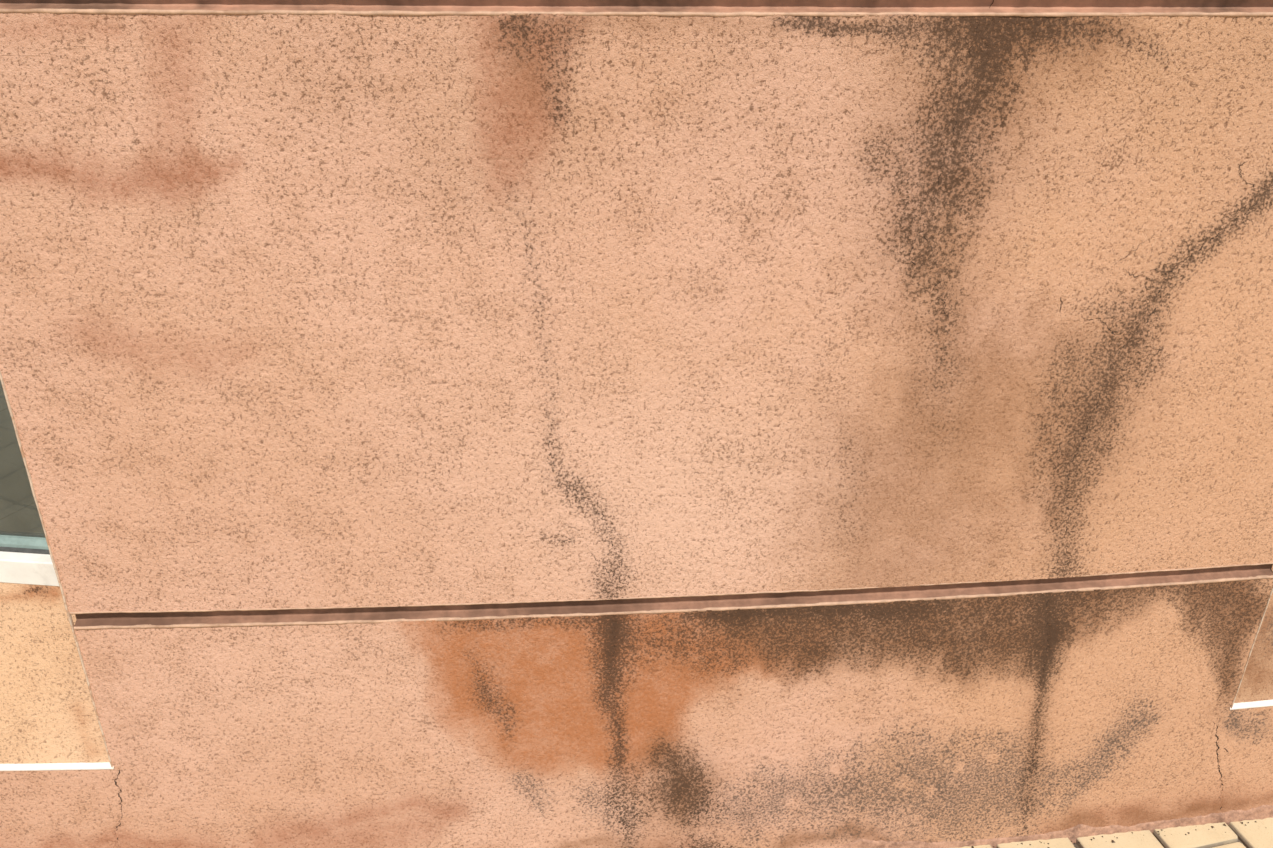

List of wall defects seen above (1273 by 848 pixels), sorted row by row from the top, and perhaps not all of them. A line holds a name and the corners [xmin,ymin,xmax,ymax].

damp [0,13,254,222]
damp [31,297,277,401]
crack [499,197,645,600]
damp [452,13,1273,848]
crack [1012,152,1273,809]
damp [0,583,65,616]
damp [63,695,109,763]
damp [0,783,520,848]
crack [498,685,645,848]
rust [380,610,813,788]